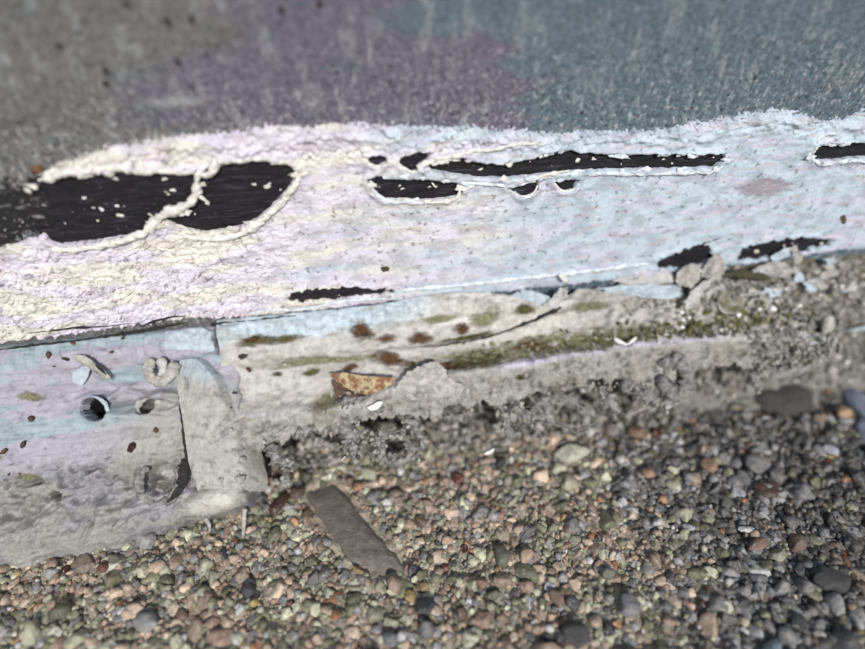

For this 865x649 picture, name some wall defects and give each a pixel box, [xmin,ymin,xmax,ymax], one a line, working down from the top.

peeling [0,156,311,254]
peeling [366,142,734,205]
peeling [806,132,865,167]
peeling [288,286,394,303]
peeling [510,242,728,310]
peeling [328,372,396,411]